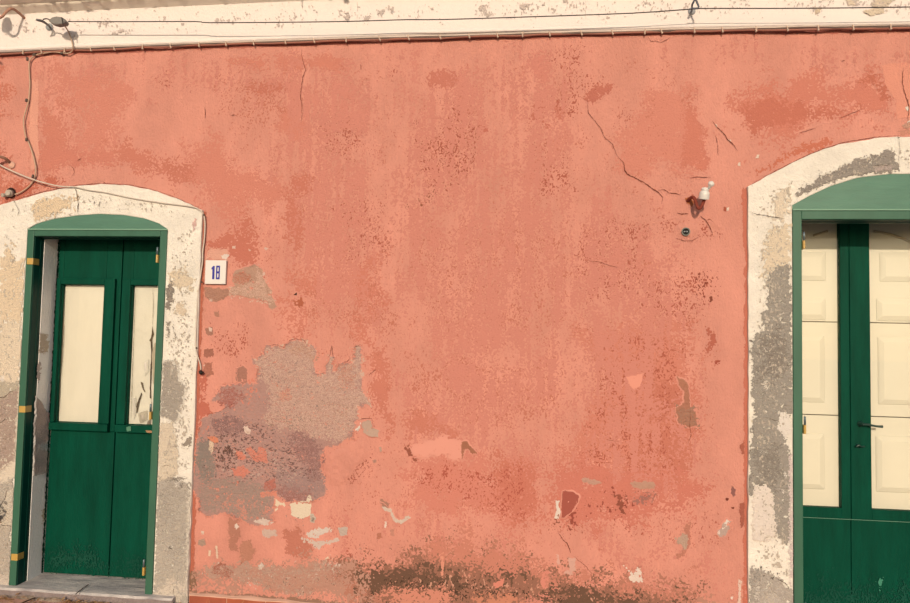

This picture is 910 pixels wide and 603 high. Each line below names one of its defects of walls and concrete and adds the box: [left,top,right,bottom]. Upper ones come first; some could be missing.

spalling [548,42,606,118]
crack [587,100,713,241]
spalling [795,149,900,197]
peeling [153,95,793,603]
spalling [0,387,19,585]